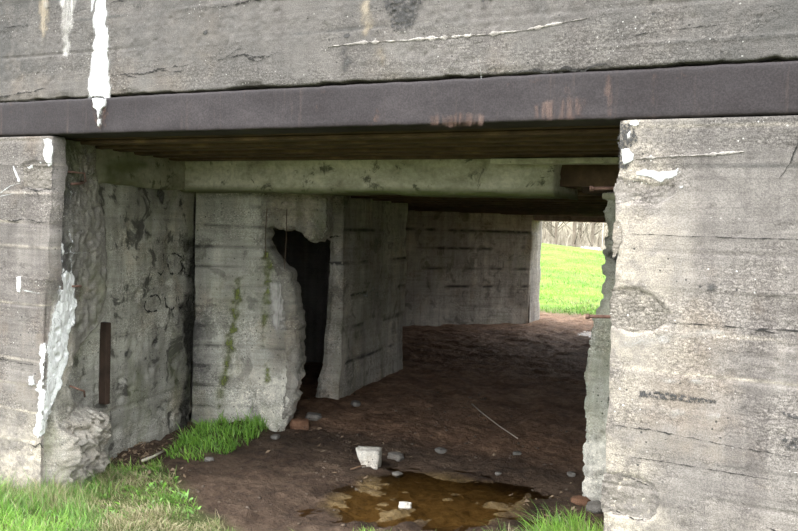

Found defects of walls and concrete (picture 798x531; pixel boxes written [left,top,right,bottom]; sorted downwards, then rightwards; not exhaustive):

water stain [88,0,110,126]
crack [219,48,276,61]
spalling [590,121,683,206]
spalling [270,263,300,420]